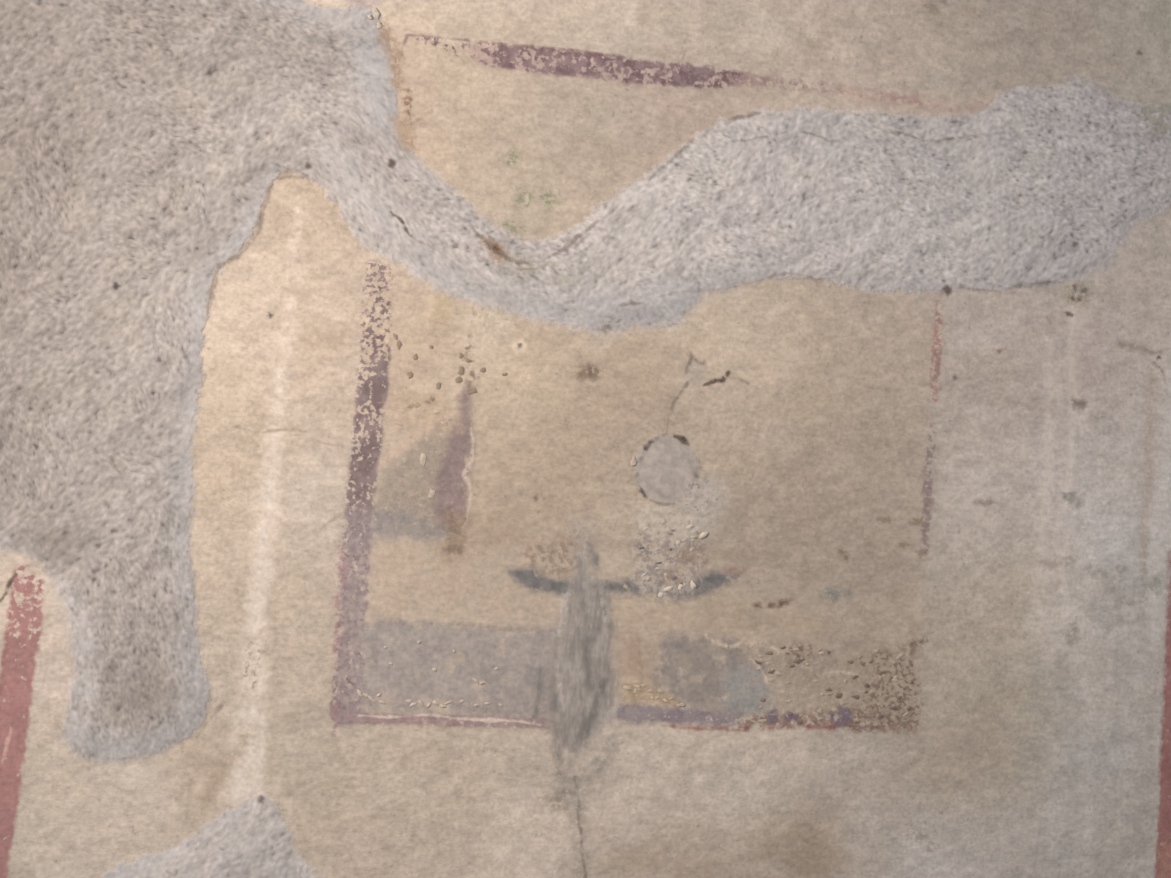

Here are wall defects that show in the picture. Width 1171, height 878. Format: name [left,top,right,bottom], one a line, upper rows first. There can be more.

peeling [455,352,486,395]
spalling [637,507,708,599]
crack [0,573,17,601]
peeling [720,642,830,684]
peeling [812,648,923,731]
peeling [758,698,803,725]